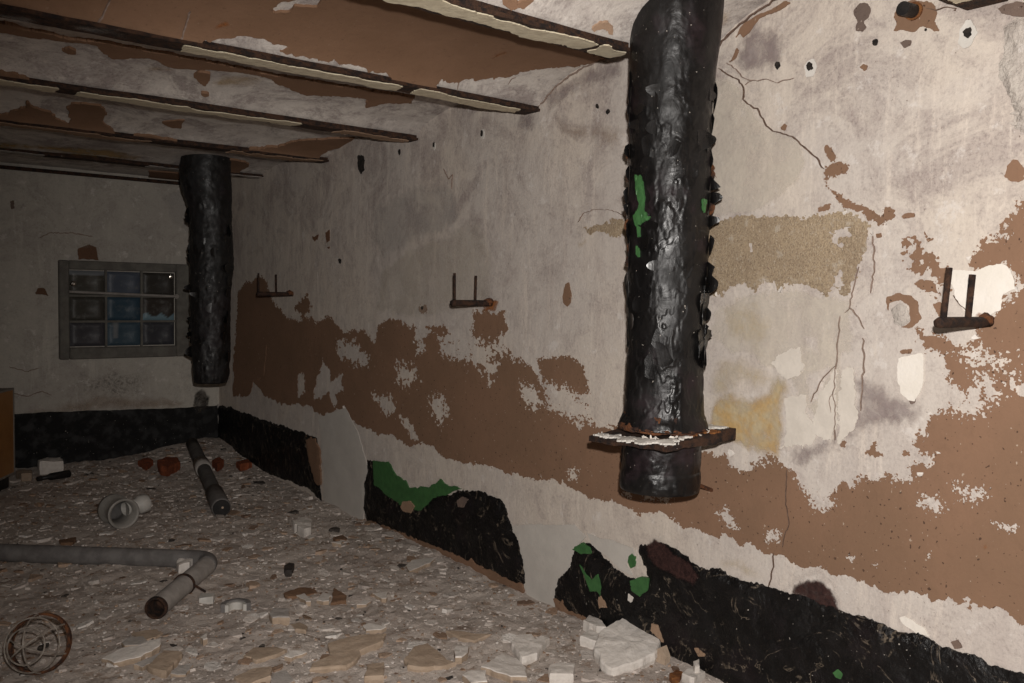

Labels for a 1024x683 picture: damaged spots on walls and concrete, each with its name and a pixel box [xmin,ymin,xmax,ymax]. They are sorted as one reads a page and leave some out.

peeling [0,69,302,134]
peeling [0,0,626,112]
peeling [249,130,409,158]
flaking render [584,72,674,379]
crack [718,0,824,169]
flaking render [697,82,915,369]
peeling [1004,159,1024,182]
crack [810,233,876,440]
peeling [202,200,1024,626]
water stain [712,381,783,453]
crack [768,470,790,587]